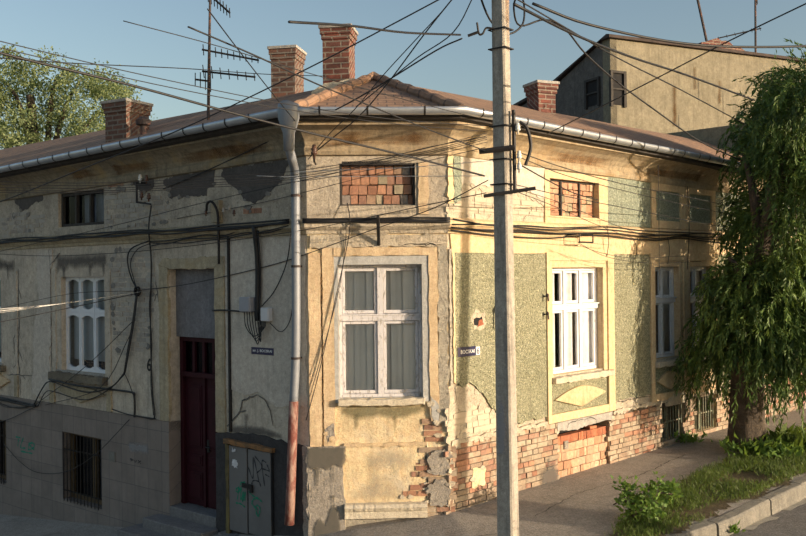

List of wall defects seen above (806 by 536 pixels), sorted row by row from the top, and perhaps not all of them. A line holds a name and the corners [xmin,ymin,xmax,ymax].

flaking render [14,195,43,212]
flaking render [104,159,289,229]
flaking render [445,183,494,220]
flaking render [513,192,544,222]
damp [58,256,105,274]
flaking render [400,385,497,516]
flaking render [517,423,560,492]